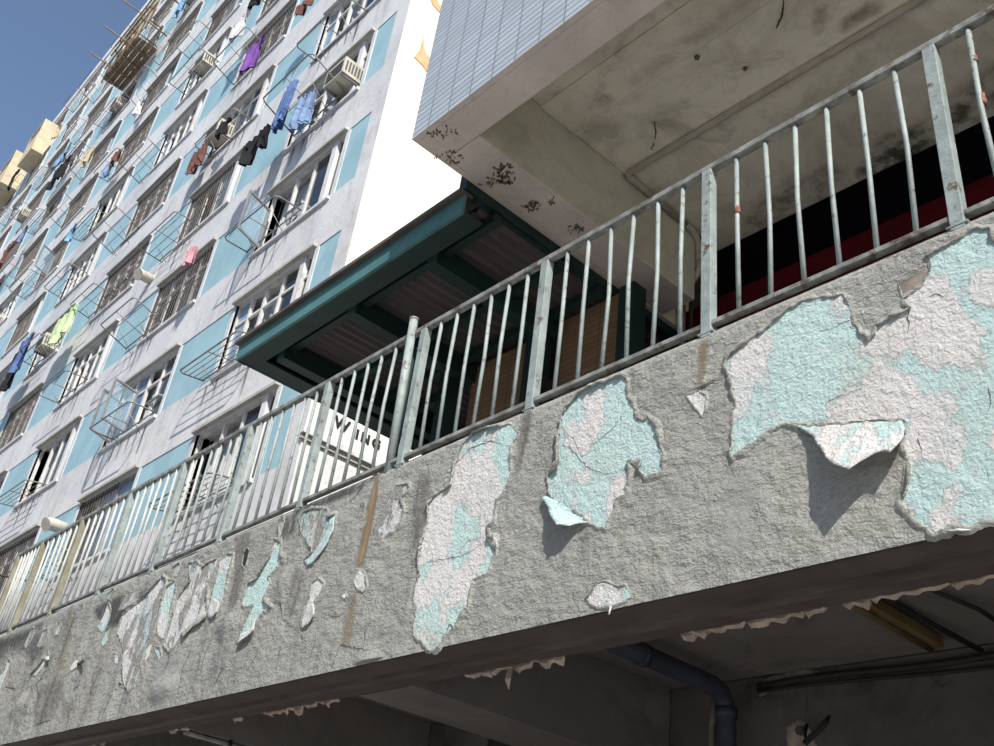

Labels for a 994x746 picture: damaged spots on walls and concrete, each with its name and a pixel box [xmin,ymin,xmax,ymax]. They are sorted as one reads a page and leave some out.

leakage [951,81,983,124]
leakage [859,130,931,175]
peeling [685,223,994,542]
peeling [541,371,672,533]
corrosion [358,477,378,565]
peeling [412,421,522,655]
peeling [96,505,339,695]
peeling [584,580,633,615]
peeling [842,574,994,611]
peeling [681,607,828,642]
peeling [463,655,565,689]